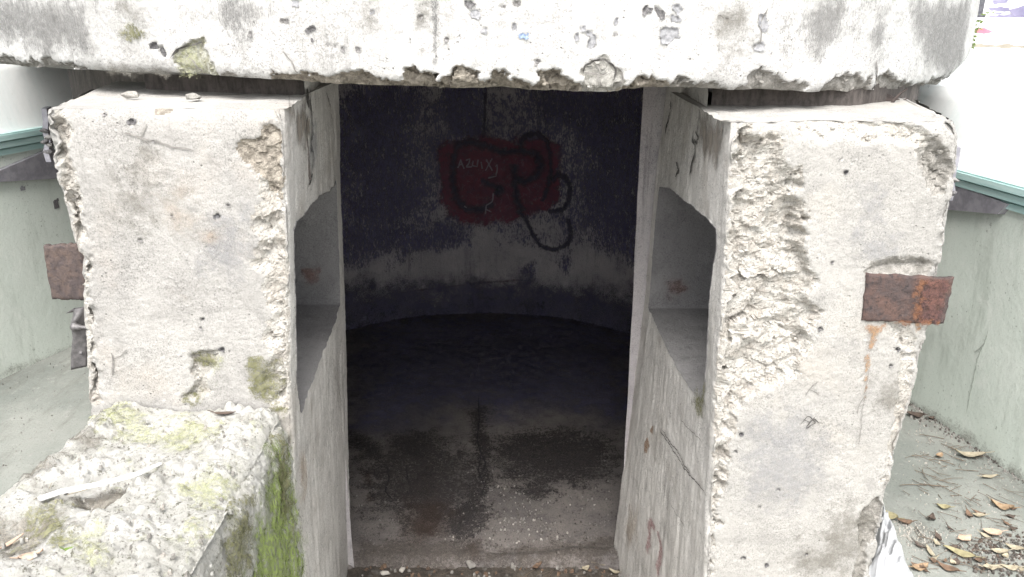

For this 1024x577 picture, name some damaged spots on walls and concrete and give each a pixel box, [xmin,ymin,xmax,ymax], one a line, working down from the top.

spalling [149,37,248,77]
spalling [270,25,949,92]
spalling [52,108,103,406]
spalling [235,124,291,415]
spalling [707,121,954,577]
corrosion [864,324,886,389]
leakage [268,433,301,539]
leakage [347,313,631,577]
crack [660,421,704,491]